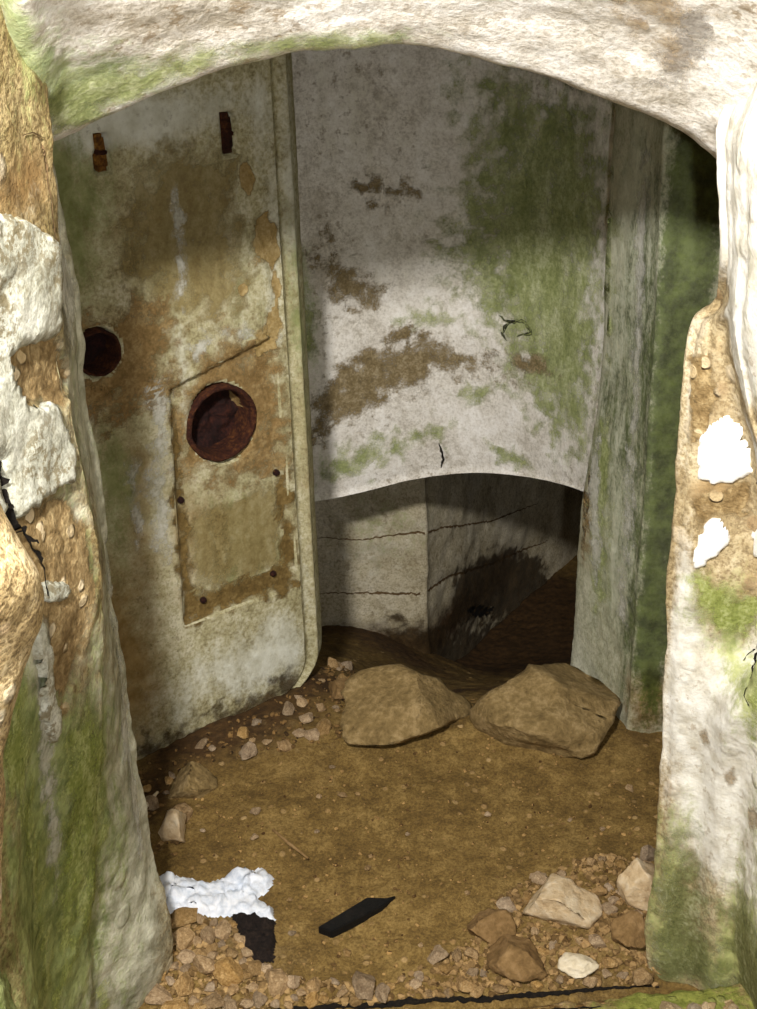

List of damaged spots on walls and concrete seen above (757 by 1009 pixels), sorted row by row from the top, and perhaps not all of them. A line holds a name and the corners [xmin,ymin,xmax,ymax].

corrosion [81,289,301,628]
water stain [386,547,547,661]